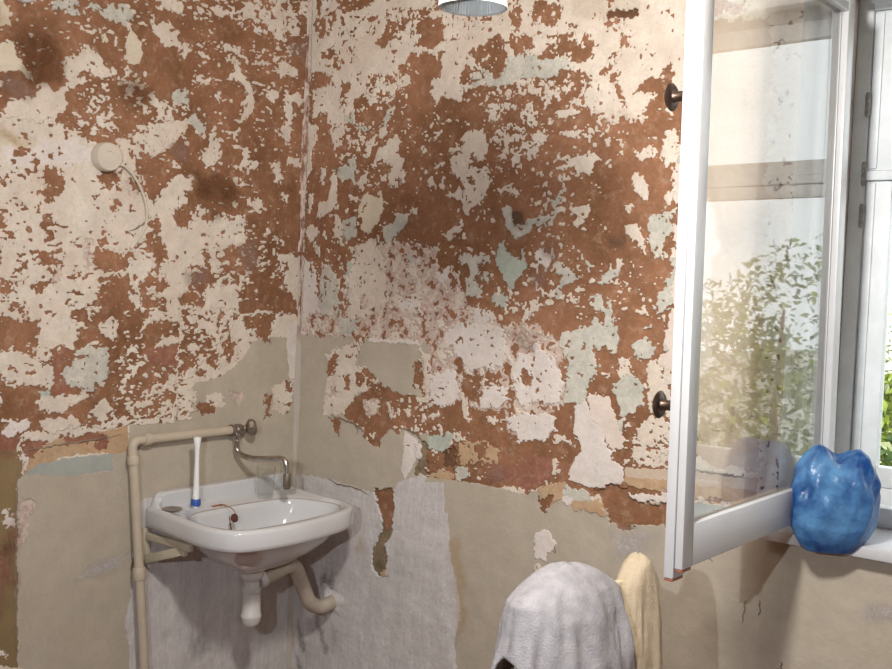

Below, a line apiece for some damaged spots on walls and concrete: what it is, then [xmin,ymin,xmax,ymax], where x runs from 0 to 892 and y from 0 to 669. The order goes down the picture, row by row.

peeling [768,158,794,213]
peeling [0,0,682,531]
spalling [372,488,395,577]
spalling [533,527,557,571]
crack [742,600,761,622]